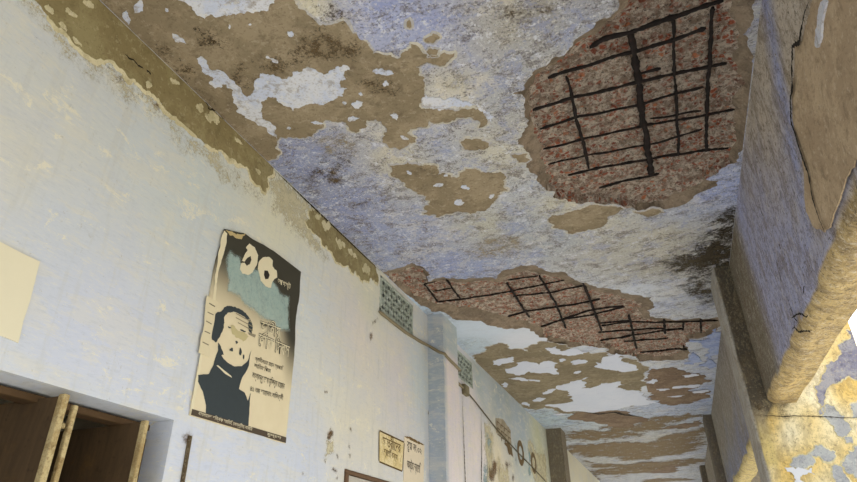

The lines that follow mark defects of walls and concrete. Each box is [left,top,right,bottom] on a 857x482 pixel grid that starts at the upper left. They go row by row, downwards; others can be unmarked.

peeling [35,0,492,196]
peeling [387,160,510,218]
spalling [304,207,720,482]
spalling [510,0,755,235]
leakage [660,208,736,305]
peeling [789,329,857,482]
peeling [790,0,857,234]